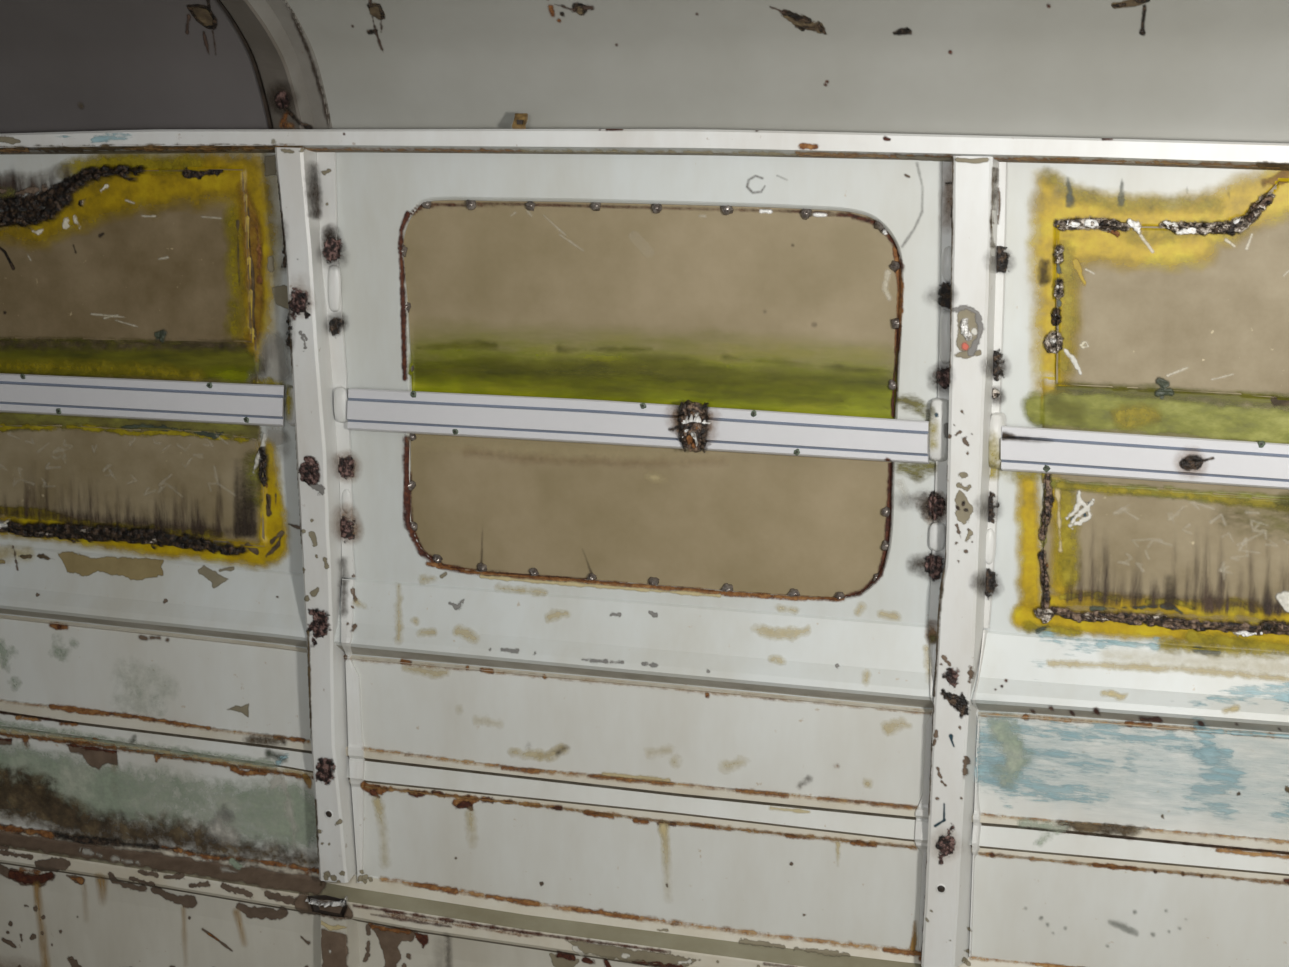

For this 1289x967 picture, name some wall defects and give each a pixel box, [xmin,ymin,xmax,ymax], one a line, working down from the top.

peeling [0,546,164,580]
corrosion [0,704,314,788]
leakage [0,722,316,846]
corrosion [361,781,917,856]
peeling [0,824,373,920]
peeling [1,905,62,948]
peeling [301,921,428,967]
peeling [549,941,700,967]
corrosion [353,878,922,961]